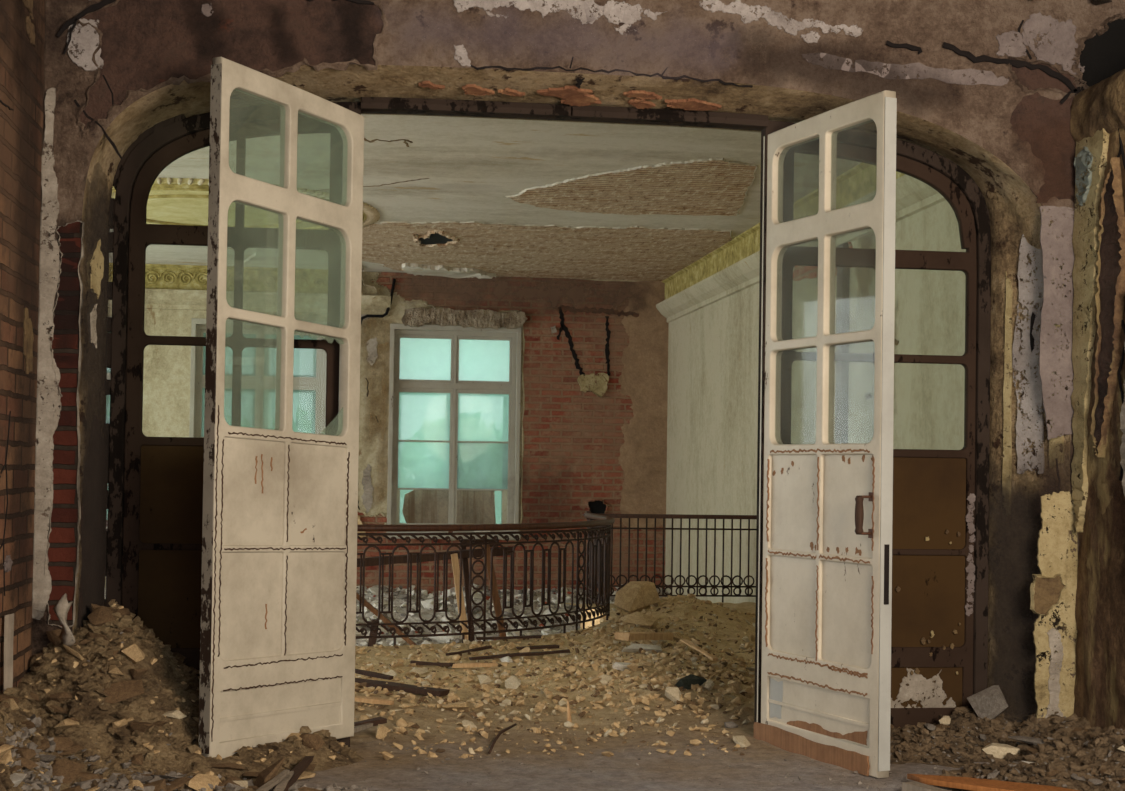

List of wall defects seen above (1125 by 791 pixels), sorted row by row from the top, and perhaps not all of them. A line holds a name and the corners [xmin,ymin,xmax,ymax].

crack [57,0,116,55]
peeling [453,0,668,35]
crack [886,20,1088,104]
spalling [23,88,104,628]
crack [556,305,639,376]
peeling [699,0,1125,719]
spalling [211,158,758,742]